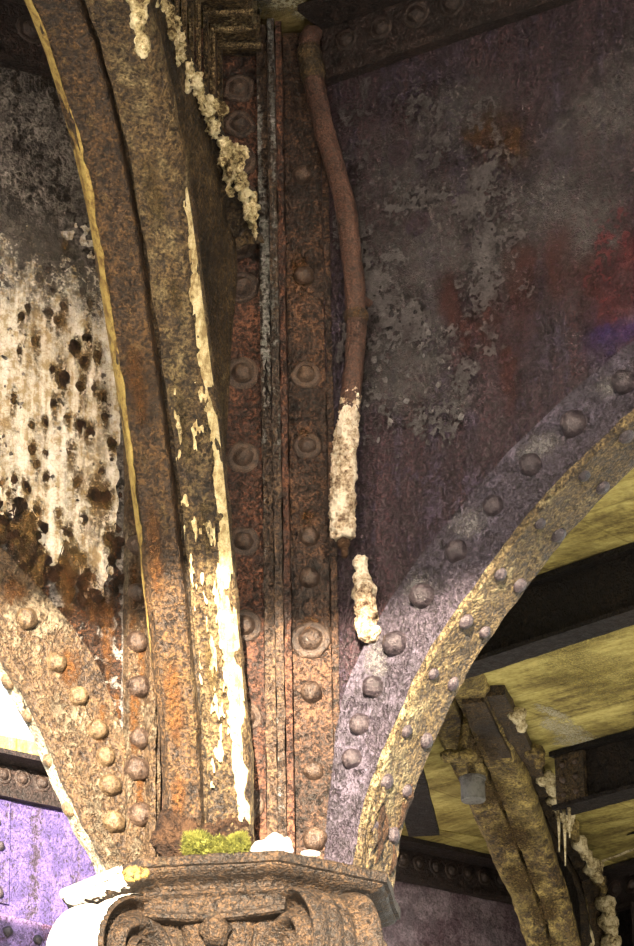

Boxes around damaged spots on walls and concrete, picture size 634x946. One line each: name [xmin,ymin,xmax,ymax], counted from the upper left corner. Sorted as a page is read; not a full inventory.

water stain [126,0,261,241]
peeling [0,0,152,661]
corrosion [0,255,117,684]
corrosion [145,510,162,591]
peeling [171,187,250,824]
efflorescence [328,386,381,644]
peeling [46,866,148,946]
corrosion [163,665,183,741]
corrosion [149,775,254,857]
corrosion [478,780,533,851]
corrosion [503,864,559,946]
efflorescence [507,705,634,946]